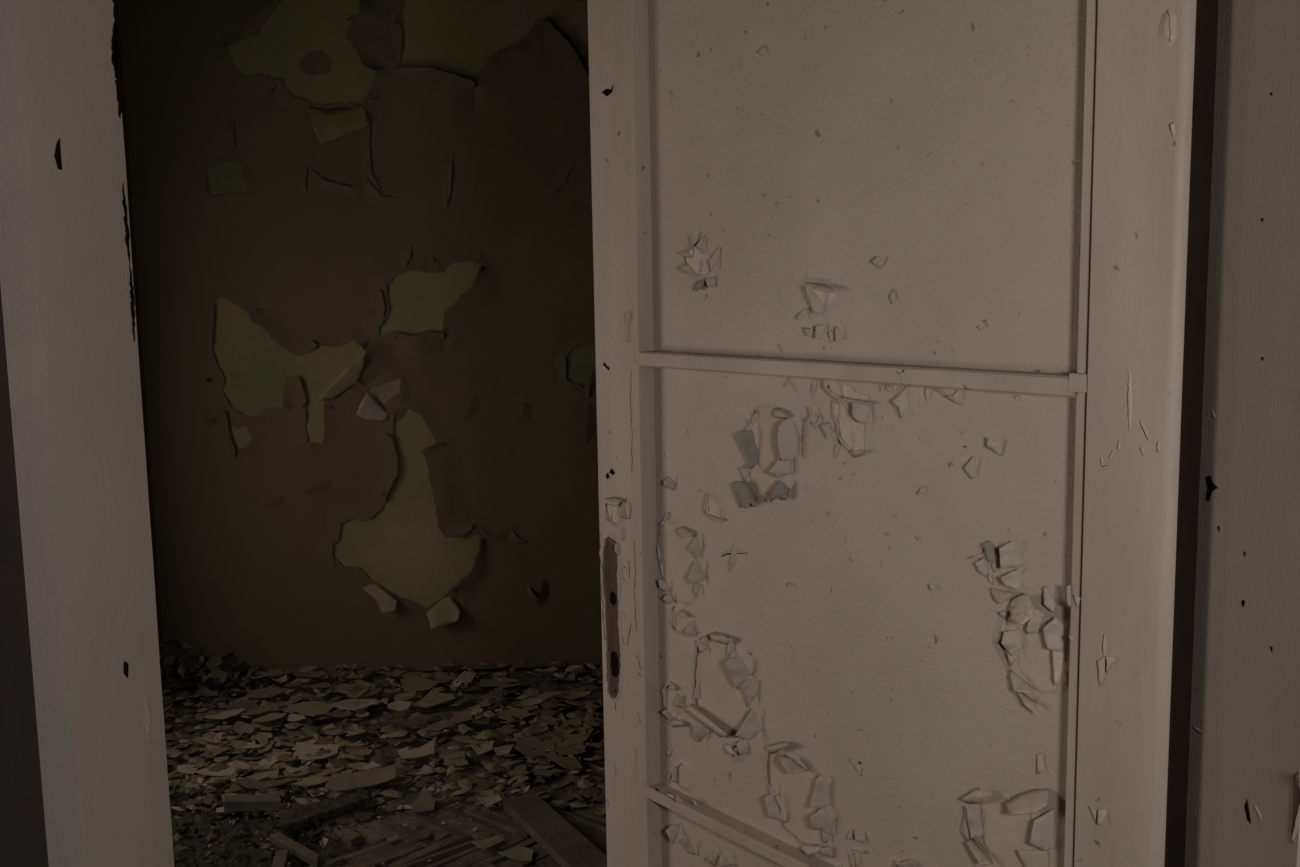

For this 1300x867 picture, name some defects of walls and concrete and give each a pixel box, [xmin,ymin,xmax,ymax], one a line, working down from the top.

peeling [370,0,613,190]
peeling [797,278,845,342]
peeling [194,286,495,629]
peeling [824,380,873,458]
peeling [892,385,918,423]
peeling [655,404,865,867]
peeling [969,534,1081,714]
peeling [960,787,1056,867]